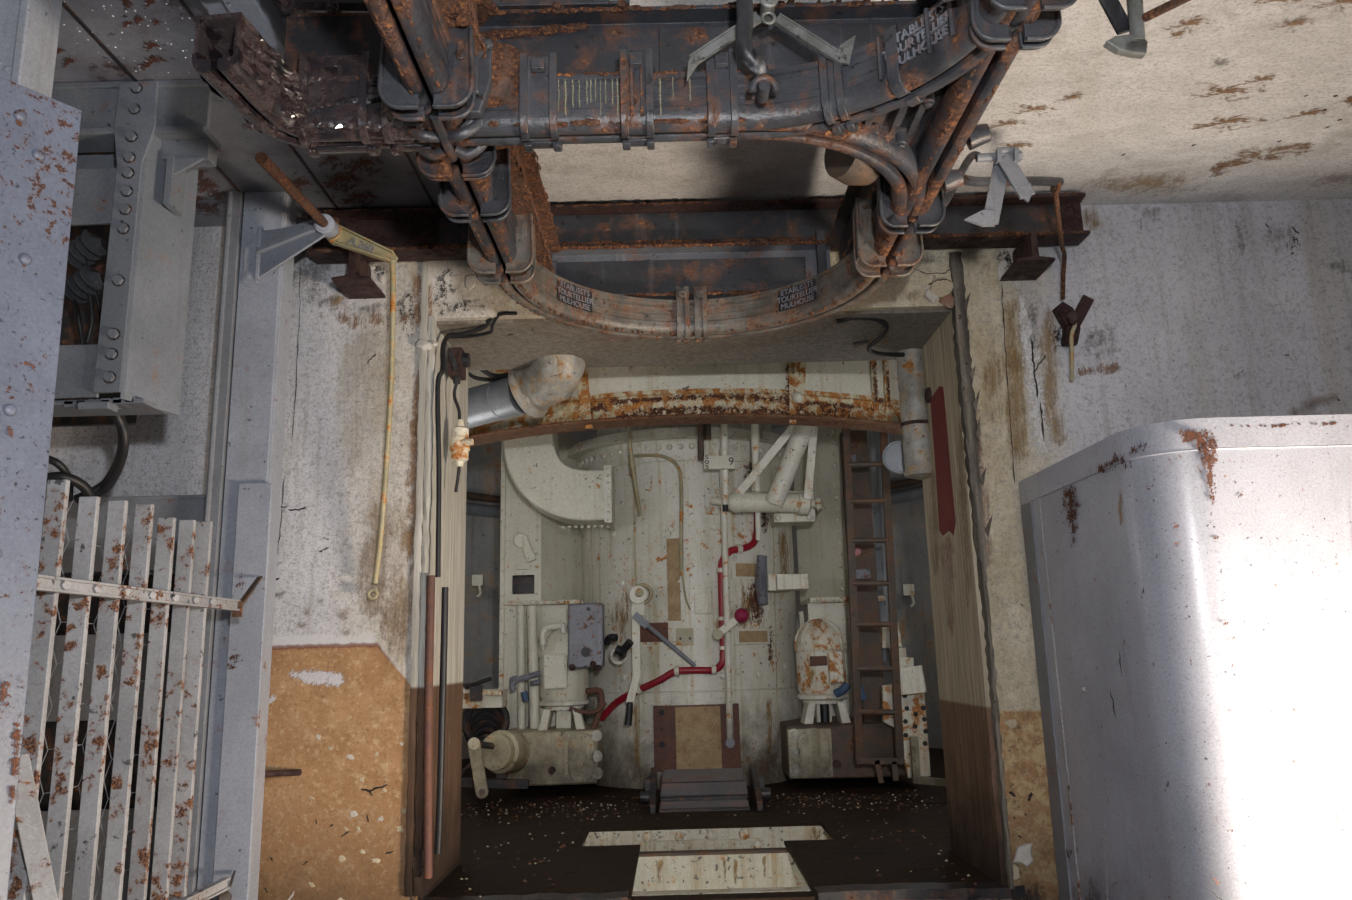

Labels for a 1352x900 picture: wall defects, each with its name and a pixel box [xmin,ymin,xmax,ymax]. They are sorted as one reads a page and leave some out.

rust [1165,15,1207,37]
rust [1254,0,1352,33]
rust [1191,75,1275,130]
rust [1286,96,1352,119]
rust [196,170,227,217]
rust [288,155,384,208]
rust [1210,143,1315,176]
rust [333,275,432,329]
rust [579,363,891,429]
water stain [984,295,1064,457]
rust [405,358,428,571]